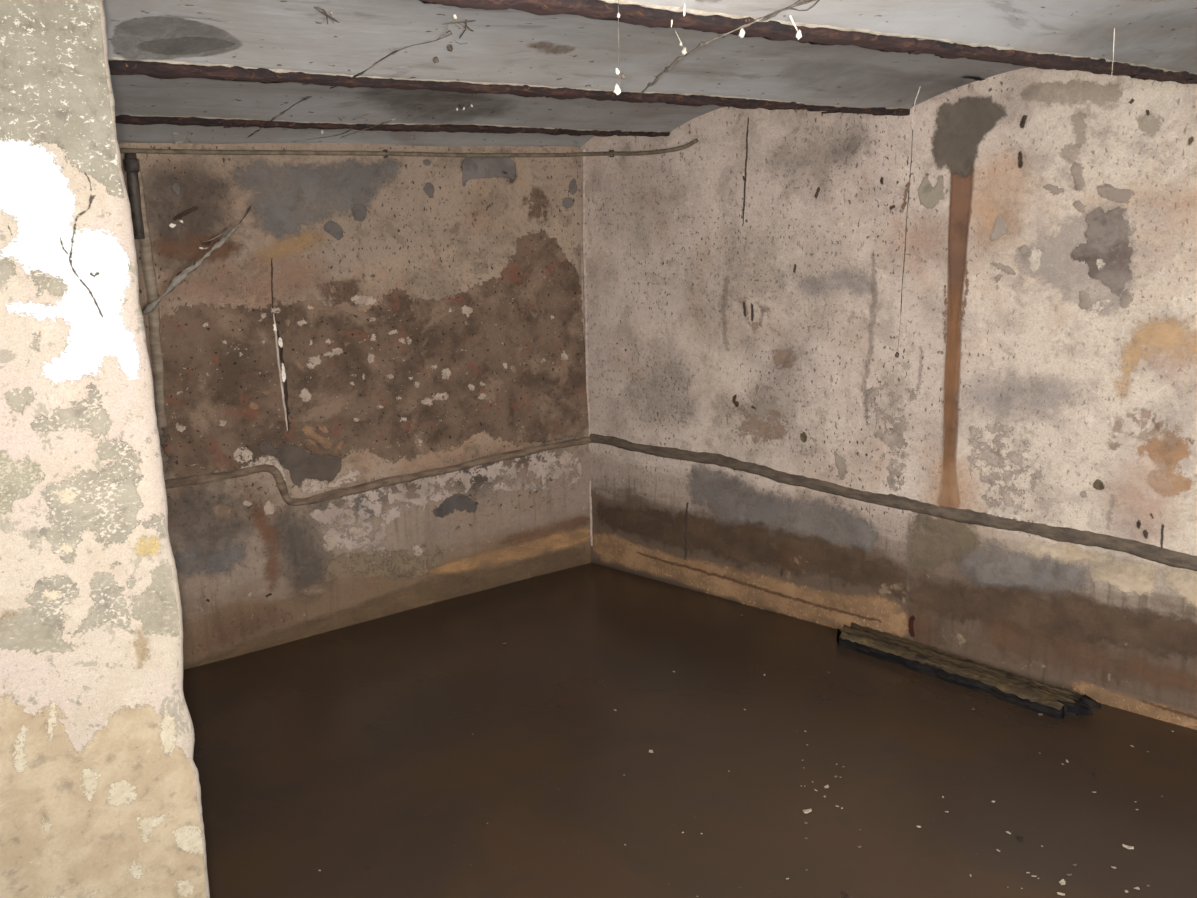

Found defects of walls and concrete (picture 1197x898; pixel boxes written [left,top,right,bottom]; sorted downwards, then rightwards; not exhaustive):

leakage [112,15,240,61]
peeling [0,257,69,297]
peeling [29,331,41,352]
crack [60,173,103,317]
corrosion [931,97,1006,508]
spalling [990,113,1135,316]
corrosion [1121,319,1197,389]
corrosion [1109,409,1194,519]
peeling [0,382,179,657]
leakage [174,490,245,577]
leakage [197,467,1197,730]